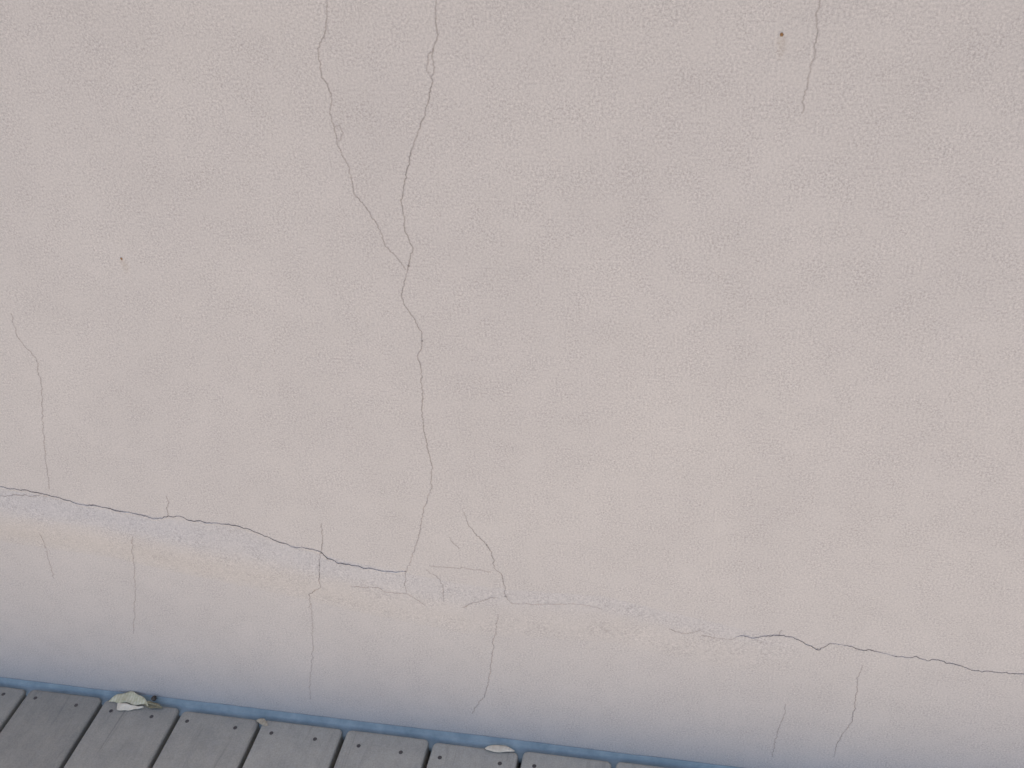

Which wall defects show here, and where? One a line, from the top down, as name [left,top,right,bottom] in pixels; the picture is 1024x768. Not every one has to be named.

crack [0,487,407,574]
crack [738,635,1024,676]